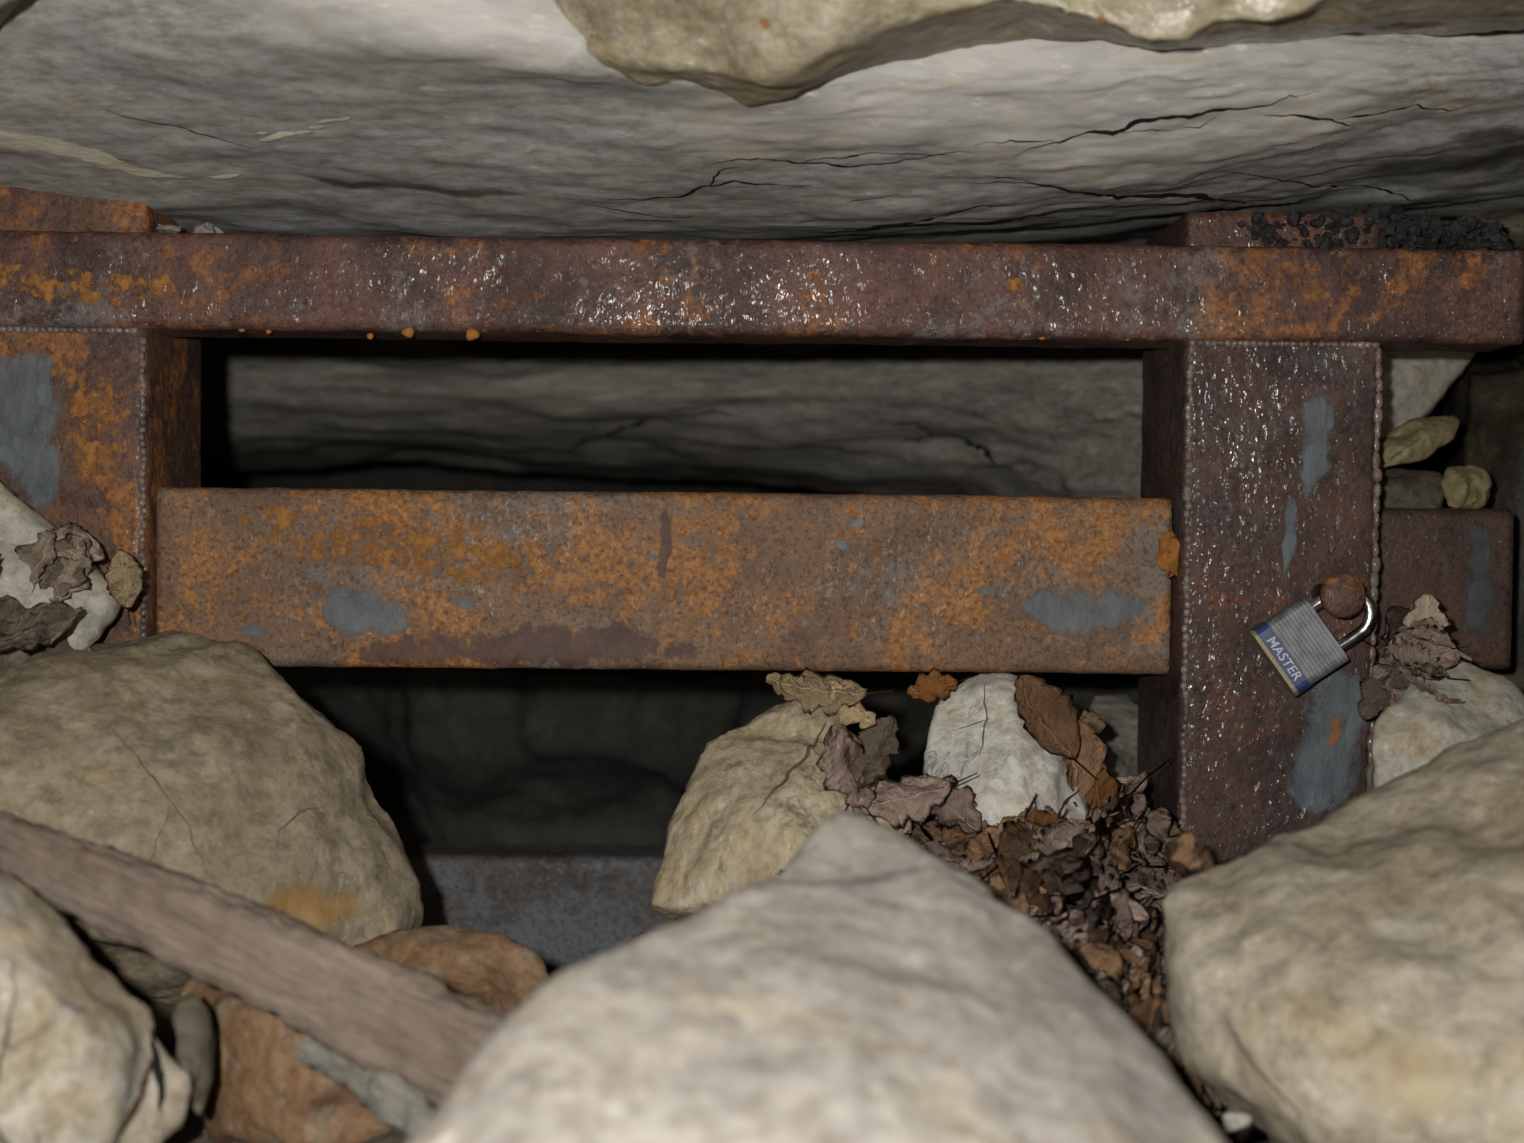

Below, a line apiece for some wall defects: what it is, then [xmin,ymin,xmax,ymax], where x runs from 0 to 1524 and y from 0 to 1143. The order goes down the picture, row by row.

rust [0,262,177,306]
rust [401,328,414,338]
rust [466,329,487,341]
rust [71,371,118,496]
rust [241,504,553,586]
rust [658,511,672,579]
rust [1156,529,1180,579]
rust [360,622,696,668]
rust [1327,716,1341,746]